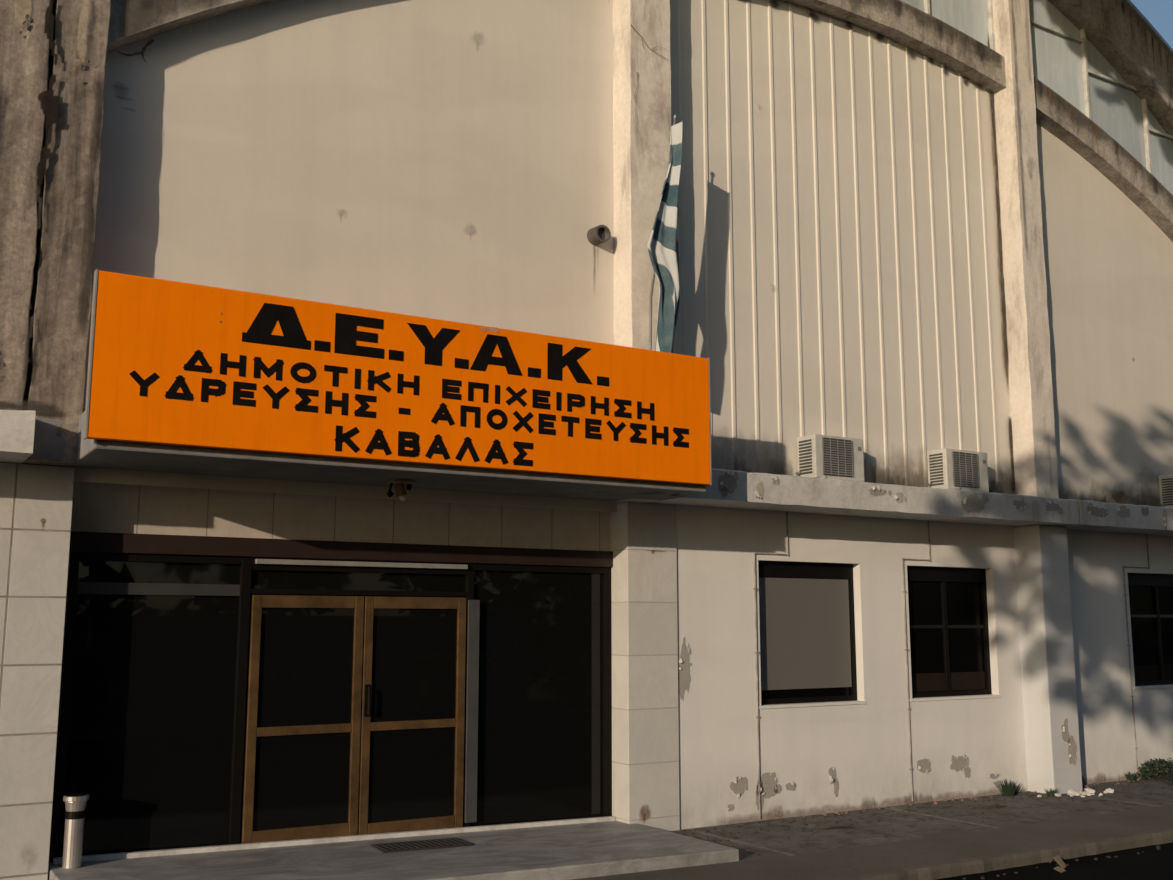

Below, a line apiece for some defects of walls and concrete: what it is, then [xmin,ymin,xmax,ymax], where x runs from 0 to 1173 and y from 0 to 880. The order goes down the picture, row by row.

peeling [962,494,989,512]
peeling [678,637,691,699]
peeling [1062,719,1077,765]
peeling [917,759,931,774]
peeling [950,755,971,778]
peeling [728,772,797,811]
peeling [829,767,839,797]